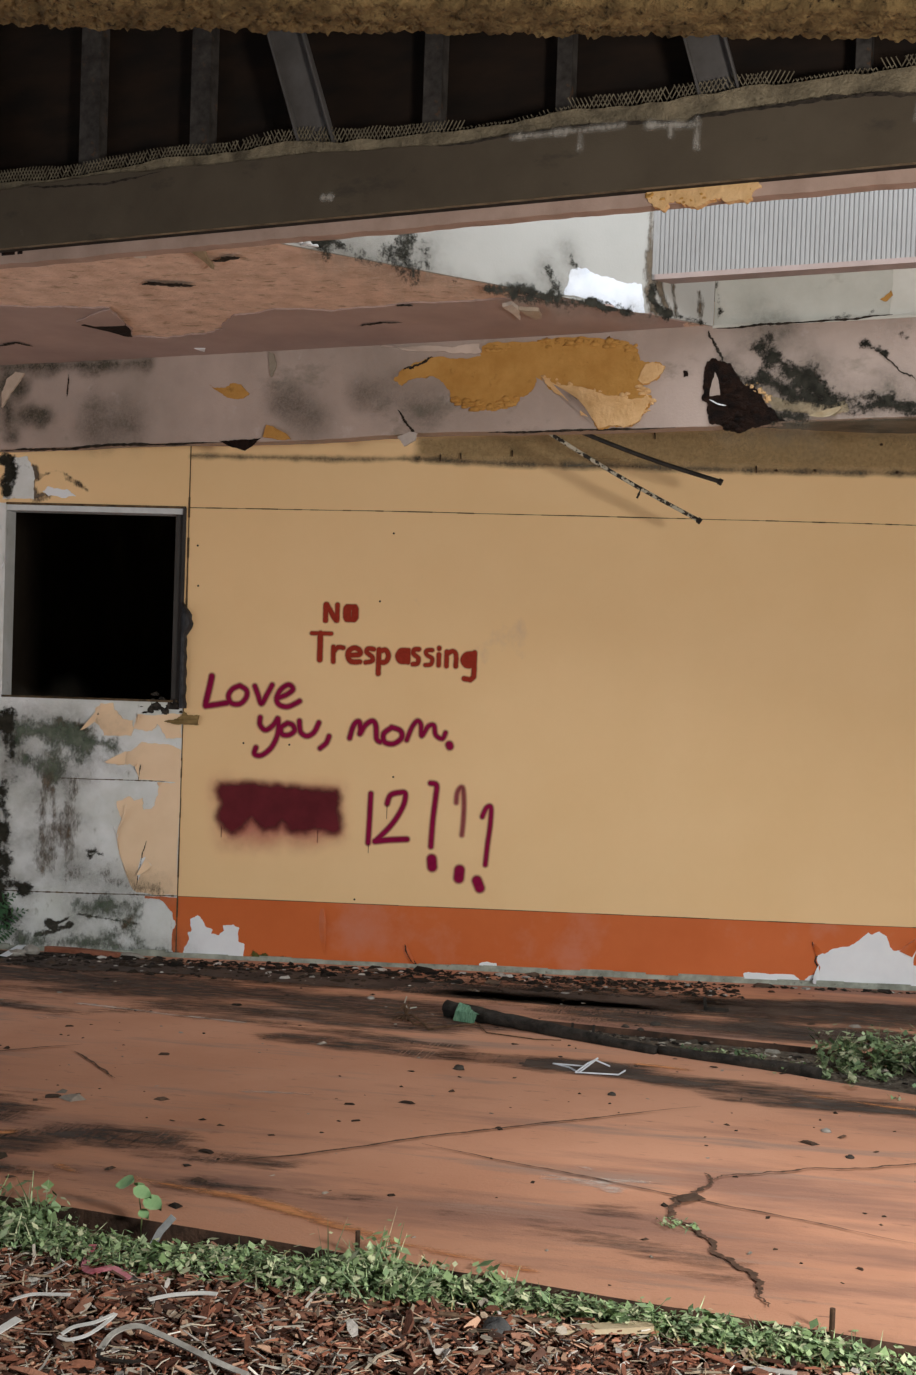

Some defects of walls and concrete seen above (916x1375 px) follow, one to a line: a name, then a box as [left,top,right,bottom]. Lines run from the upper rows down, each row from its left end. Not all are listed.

peeling [0,268,687,430]
leakage [421,333,916,468]
spalling [701,331,849,433]
peeling [80,703,244,956]
leakage [0,708,916,1117]
peeling [743,932,916,986]
crack [216,1106,916,1307]